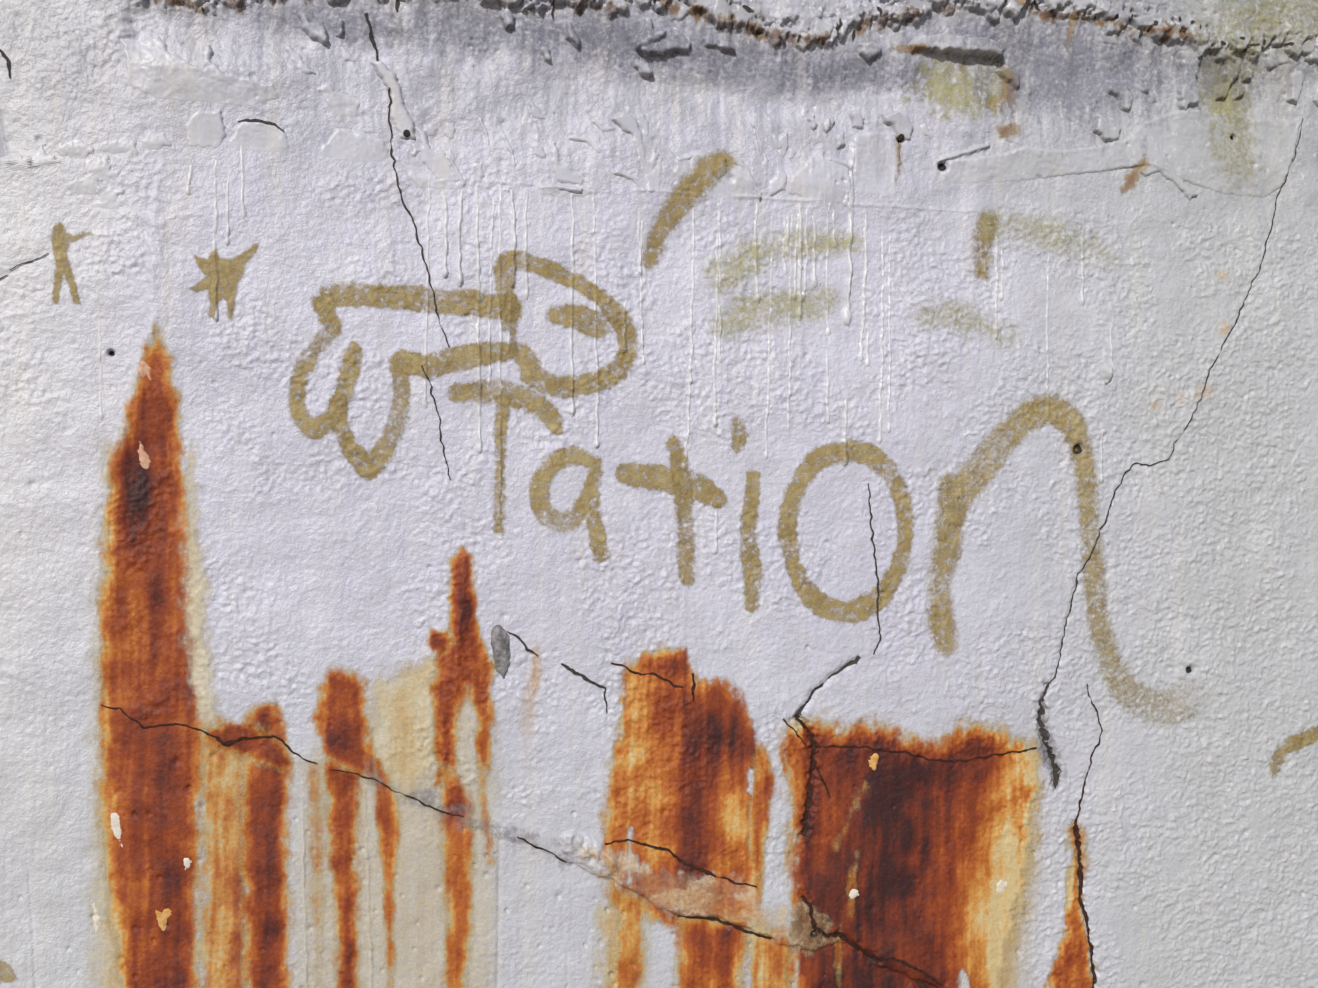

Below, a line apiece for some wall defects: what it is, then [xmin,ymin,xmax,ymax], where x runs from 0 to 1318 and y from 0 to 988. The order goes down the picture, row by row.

peeling [284,0,516,190]
peeling [521,99,931,210]
peeling [599,0,1026,89]
peeling [935,0,1318,201]
crack [783,118,1304,988]
corrosion [96,325,293,988]
crack [101,705,464,817]
corrosion [308,670,401,988]
corrosion [428,546,494,988]
crack [507,631,696,713]
crack [677,915,772,940]
corrosion [600,647,1043,988]